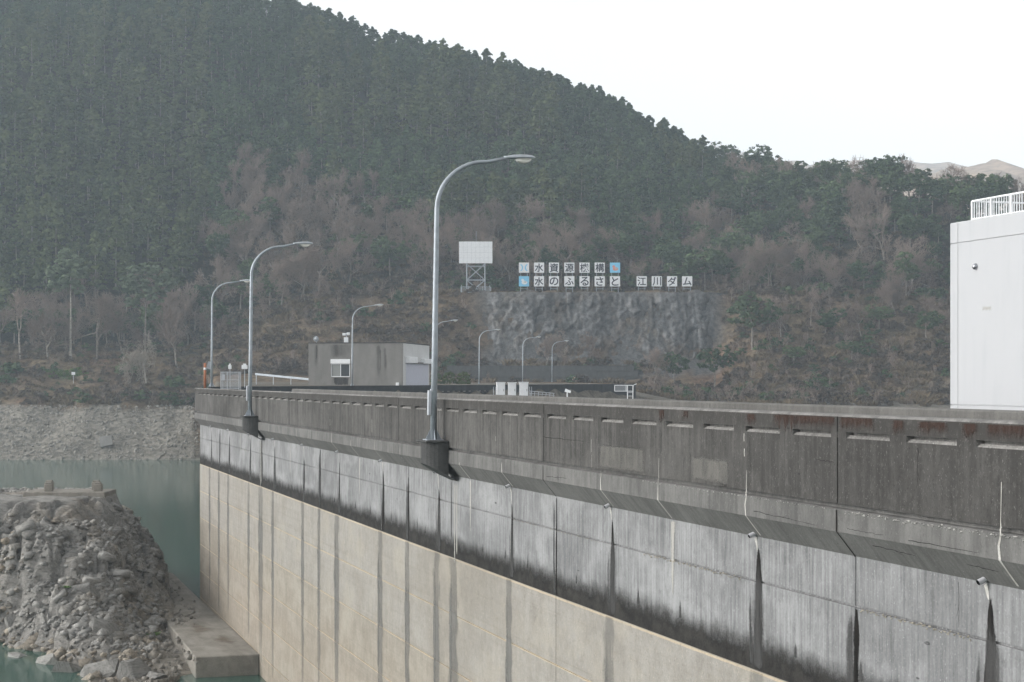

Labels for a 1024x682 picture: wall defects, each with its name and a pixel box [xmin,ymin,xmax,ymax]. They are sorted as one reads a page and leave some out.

corrosion [774,414,872,431]
corrosion [918,421,948,436]
corrosion [964,423,1024,439]
water stain [200,423,864,682]
water stain [997,482,1019,587]
water stain [976,584,999,682]